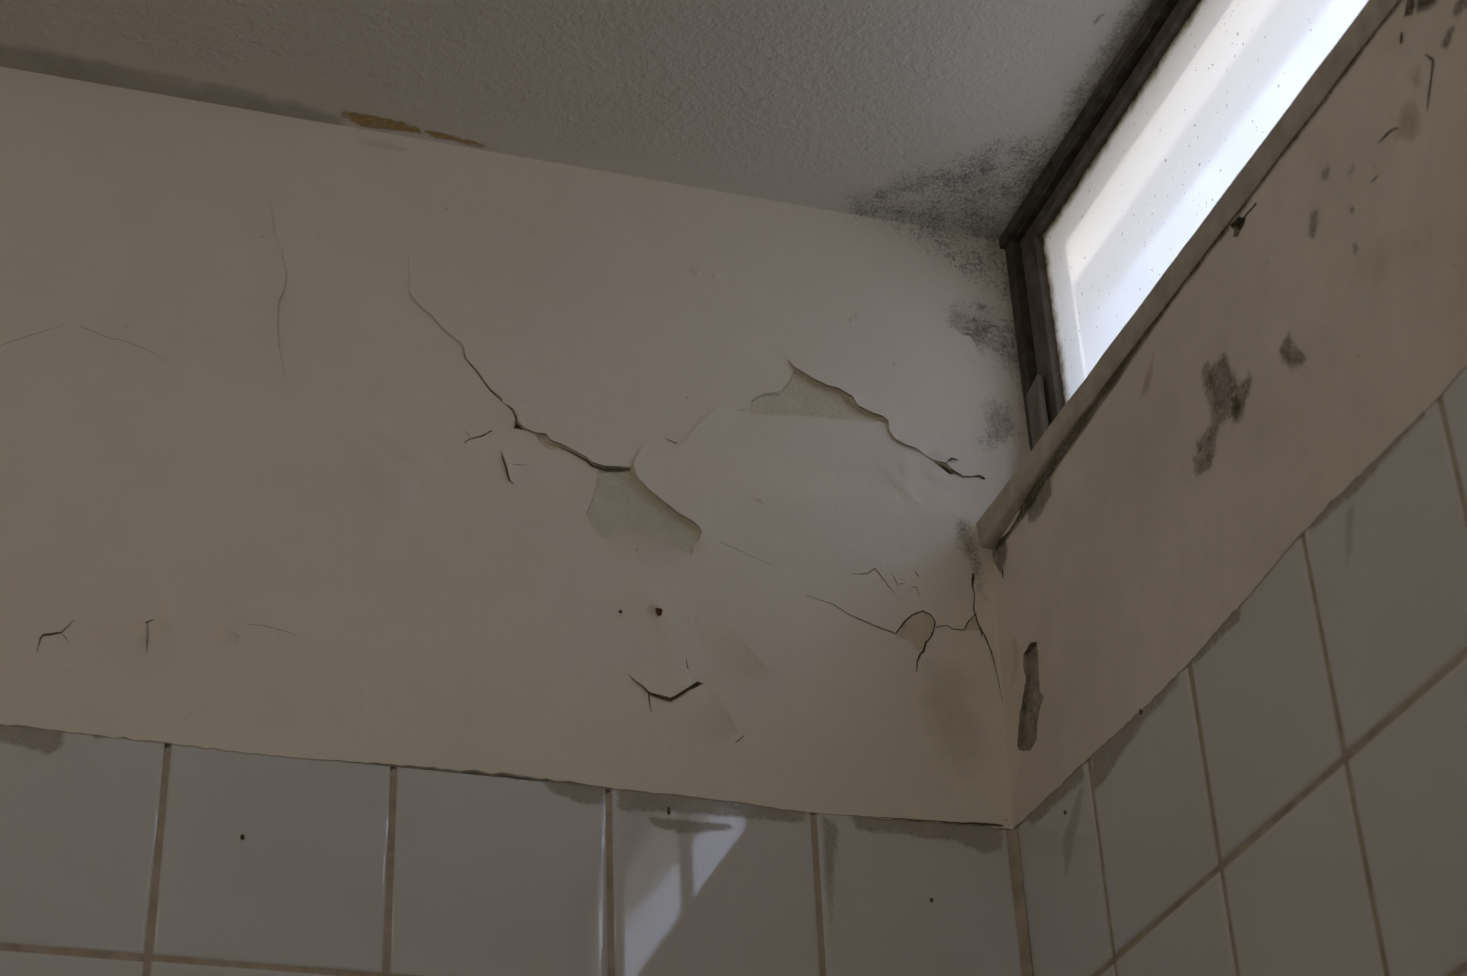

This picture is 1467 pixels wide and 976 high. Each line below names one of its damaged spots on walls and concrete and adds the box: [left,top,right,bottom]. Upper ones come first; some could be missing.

peeling [408,233,986,575]
peeling [628,658,745,747]
crack [805,568,1003,701]
flaking render [1022,643,1044,751]